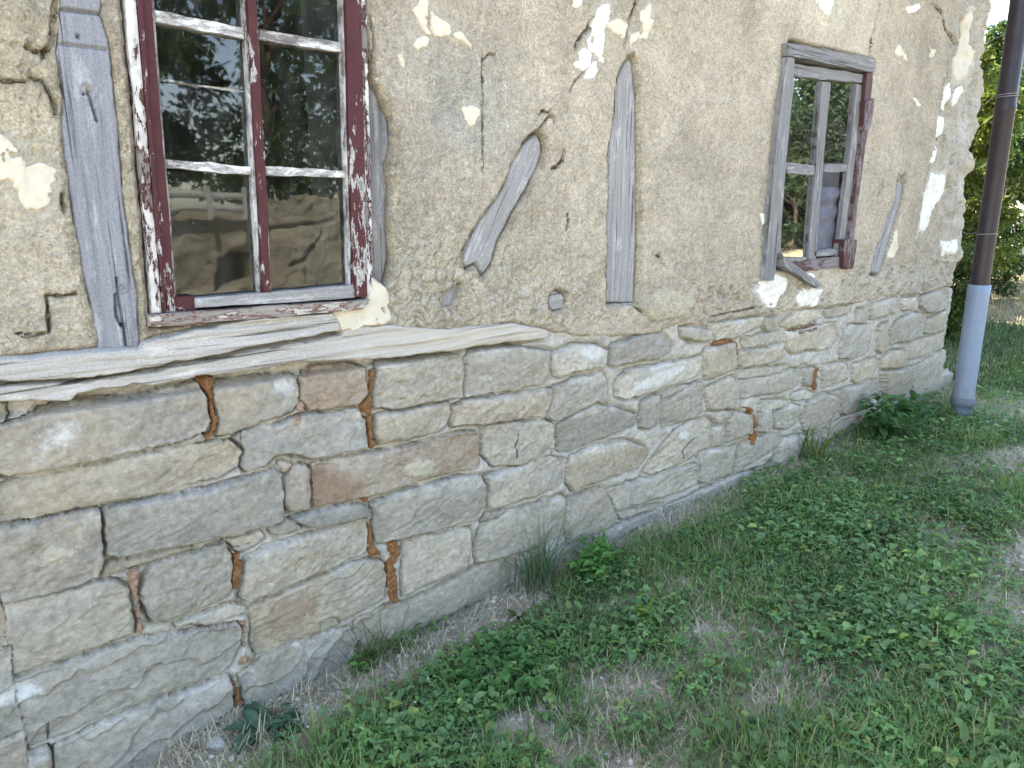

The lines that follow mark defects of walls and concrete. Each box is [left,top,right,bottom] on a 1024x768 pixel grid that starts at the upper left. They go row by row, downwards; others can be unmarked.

crack [16,293,77,338]
peeling [0,133,98,347]
flaking render [102,18,148,341]
peeling [333,127,401,332]
flaking render [367,20,394,115]
peeling [412,0,472,52]
peeling [461,102,481,128]
crack [481,55,493,166]
peeling [572,0,671,308]
peeling [751,271,824,311]
peeling [914,3,977,242]